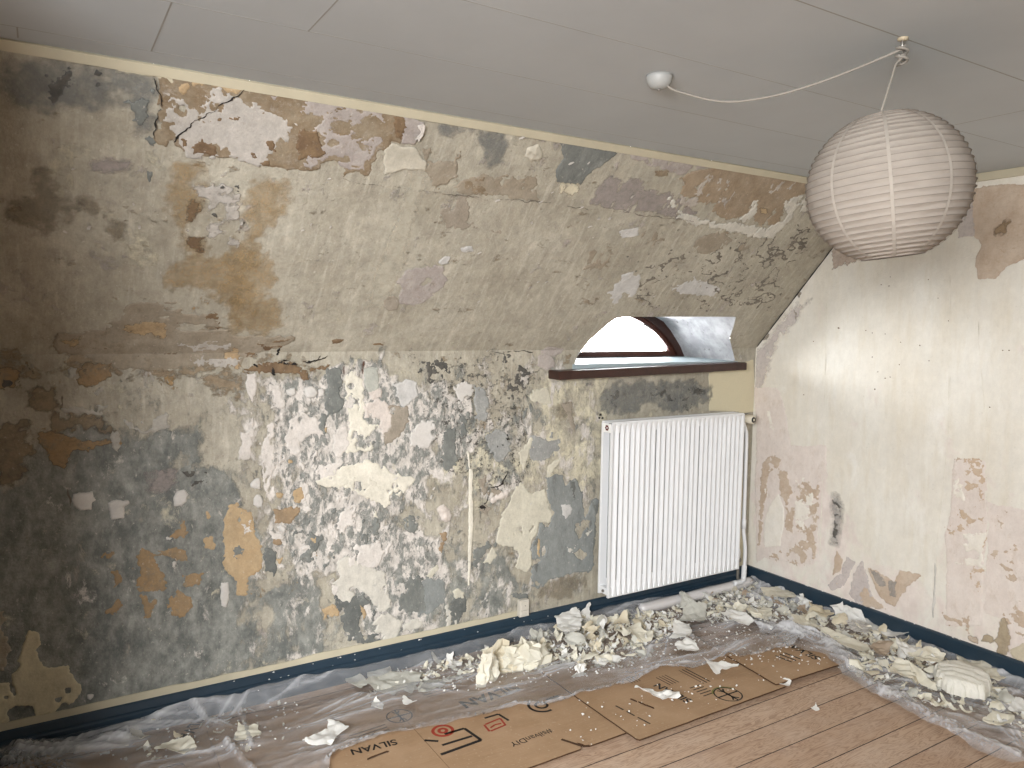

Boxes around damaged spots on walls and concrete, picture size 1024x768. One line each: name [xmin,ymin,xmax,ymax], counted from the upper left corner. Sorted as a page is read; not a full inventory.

crack [153,78,244,142]
peeling [153,77,617,230]
water stain [164,164,284,331]
spalling [607,272,641,304]
peeling [579,155,808,254]
peeling [958,184,1024,280]
water stain [600,379,712,413]
peeling [0,302,599,644]
water stain [831,498,841,544]
peeling [828,551,921,609]
peeling [932,457,1024,637]
peeling [0,611,82,723]